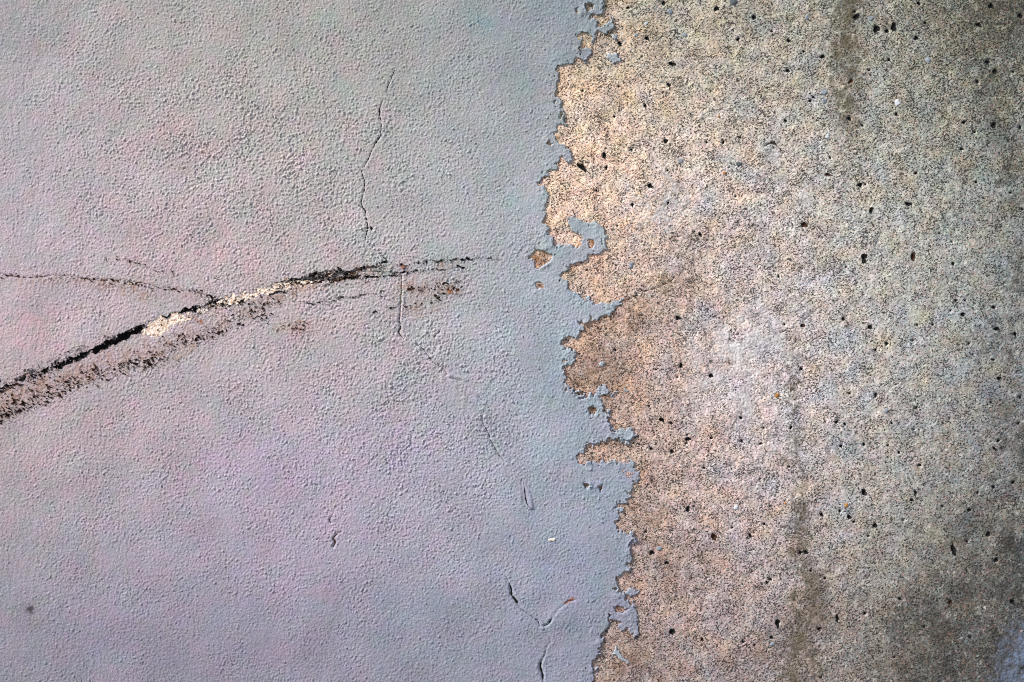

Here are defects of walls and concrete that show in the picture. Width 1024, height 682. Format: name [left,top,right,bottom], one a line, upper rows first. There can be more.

crack [0,257,219,296]
crack [358,70,453,379]
peeling [529,0,1024,682]
crack [509,583,572,680]